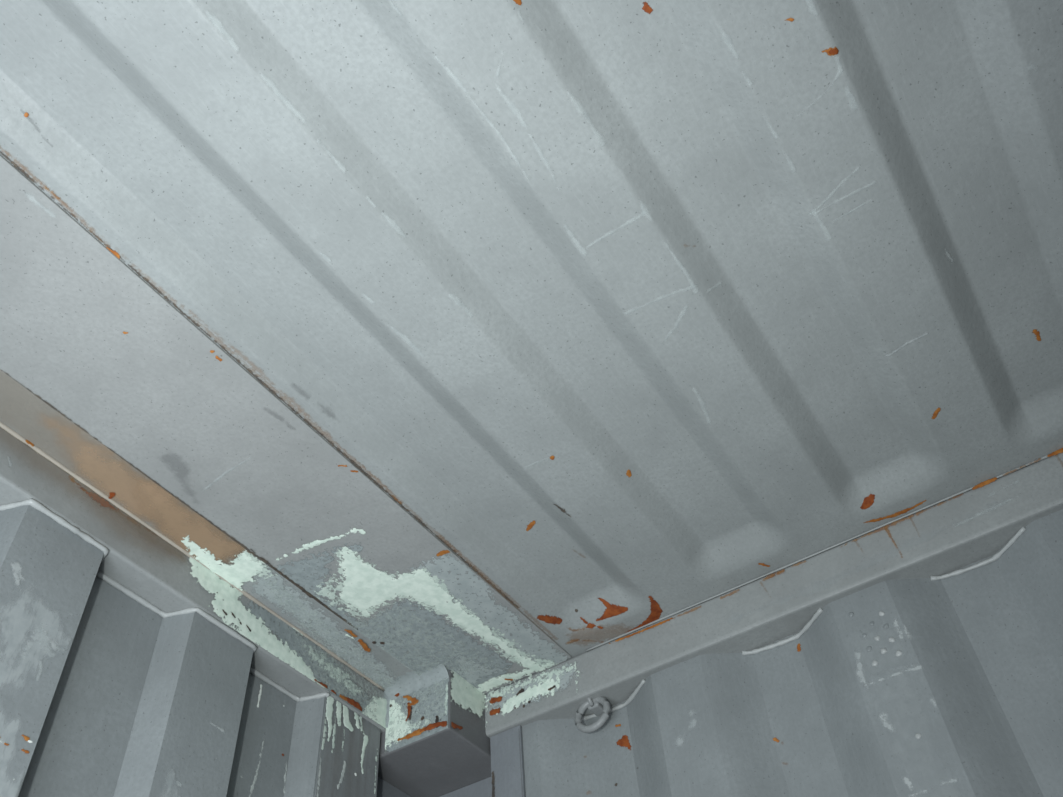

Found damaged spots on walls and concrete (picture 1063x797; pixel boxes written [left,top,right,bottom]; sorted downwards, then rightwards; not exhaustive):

rust [938,448,1063,505]
rust [71,478,153,534]
rust [854,494,926,548]
peeling [181,528,580,752]
rust [537,598,628,644]
rust [602,596,701,644]
rust [397,721,463,741]
rust [615,724,631,750]